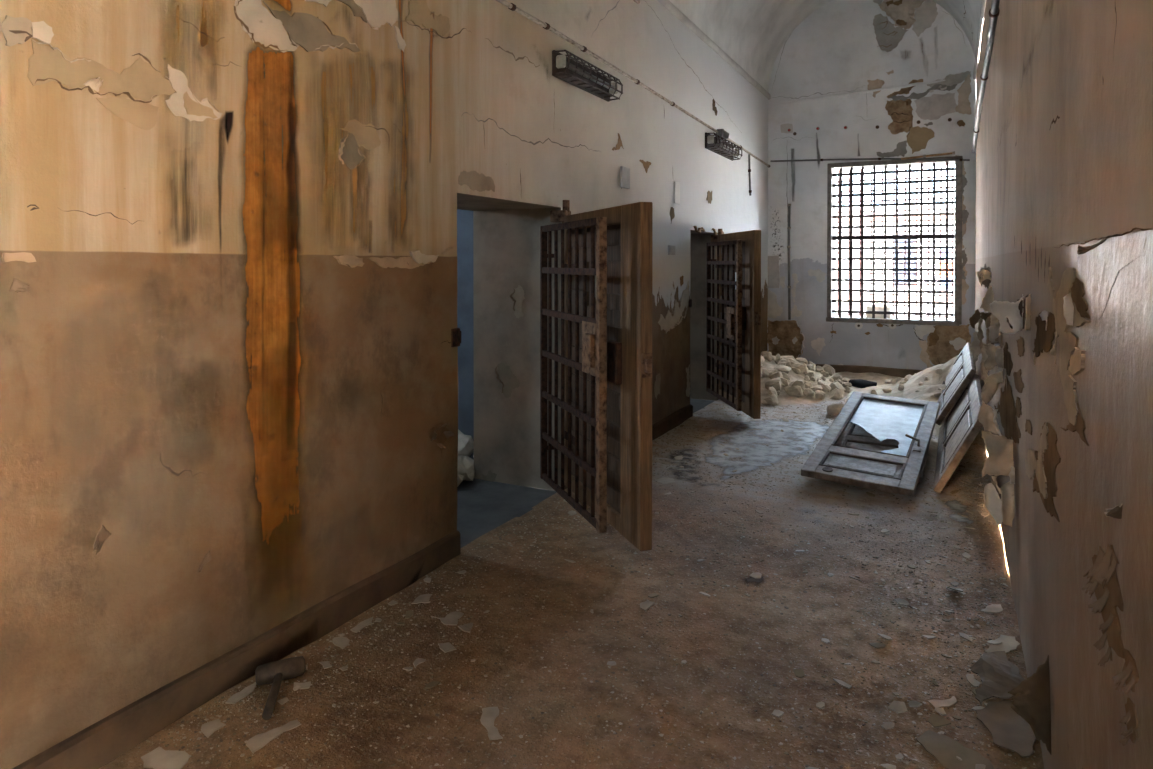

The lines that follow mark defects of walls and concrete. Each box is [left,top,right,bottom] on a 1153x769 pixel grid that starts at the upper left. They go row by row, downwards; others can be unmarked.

crack [27,204,137,224]
peeling [1,15,223,121]
damp [169,119,188,234]
damp [169,0,219,73]
peeling [234,0,399,53]
damp [320,59,376,227]
damp [391,72,412,238]
crack [462,103,596,151]
spalling [873,0,938,52]
peeling [867,70,972,158]
corrosion [218,45,304,574]
peeling [919,155,1153,527]